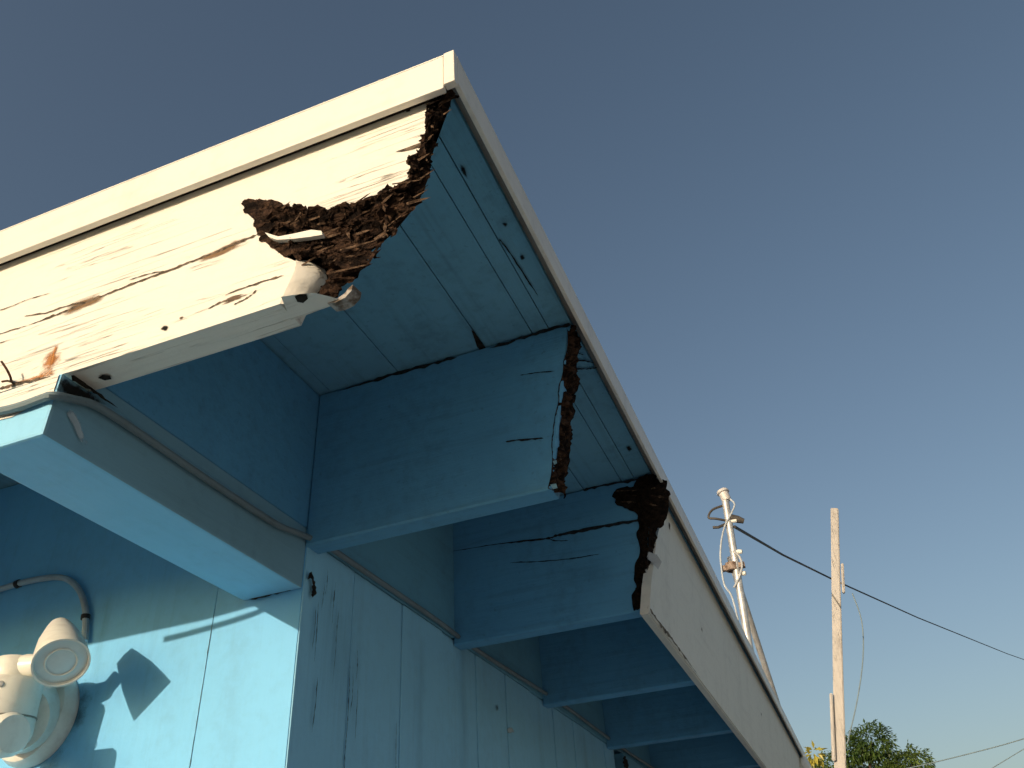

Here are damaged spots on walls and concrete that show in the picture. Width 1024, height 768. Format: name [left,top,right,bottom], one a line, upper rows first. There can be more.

peeling [266,230,325,243]
crack [0,235,255,343]
crack [456,519,638,563]